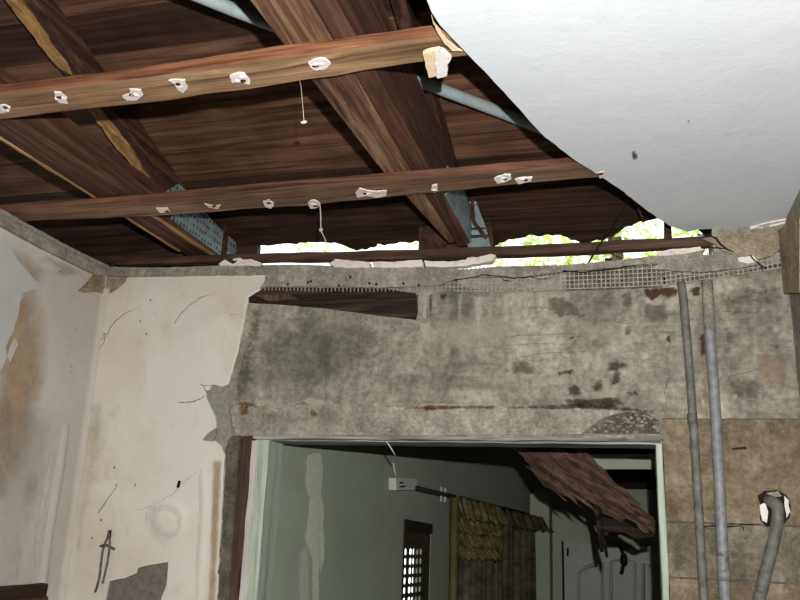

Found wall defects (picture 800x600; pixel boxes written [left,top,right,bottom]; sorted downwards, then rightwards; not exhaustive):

crack [697,234,767,270]
peeling [0,238,42,371]
flaking render [78,275,128,294]
damp [549,298,578,316]
damp [645,305,667,321]
corrosion [644,288,678,301]
damp [0,292,36,468]
flaking render [179,289,261,454]
mould [609,361,626,384]
mould [511,382,646,413]
spalling [582,412,660,434]
flaking render [107,561,168,600]